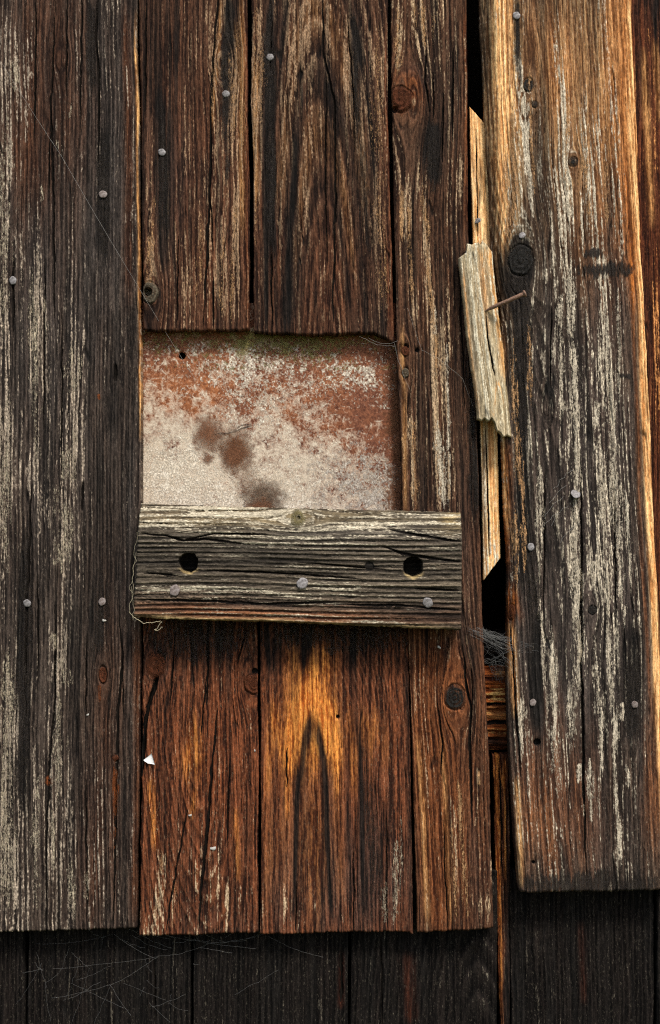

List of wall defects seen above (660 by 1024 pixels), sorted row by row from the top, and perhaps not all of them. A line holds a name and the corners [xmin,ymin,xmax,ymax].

crack [322,0,355,331]
rust [195,416,252,473]
rust [243,483,281,508]
rust [383,348,401,511]
crack [113,529,461,1024]